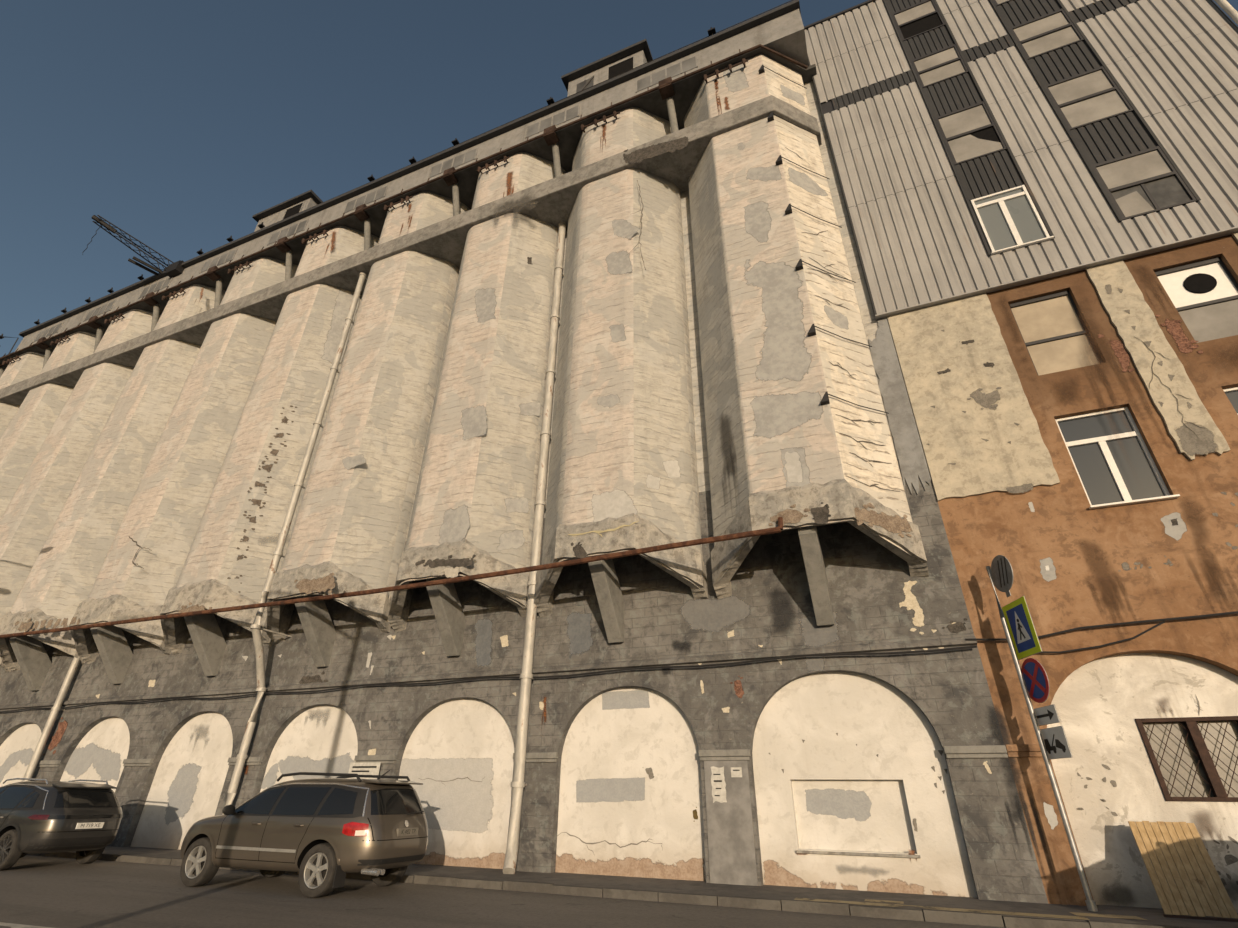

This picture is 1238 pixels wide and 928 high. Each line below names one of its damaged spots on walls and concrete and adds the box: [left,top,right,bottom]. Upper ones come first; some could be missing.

rust [503,172,514,197]
crack [801,230,850,310]
spalling [237,406,298,560]
water stain [722,418,734,476]
flaking render [744,260,823,487]
spalling [769,502,831,526]
crack [836,414,895,491]
flaking render [962,387,1002,413]
crack [1135,337,1206,437]
flaking render [1175,402,1218,456]
flaking render [899,581,971,651]